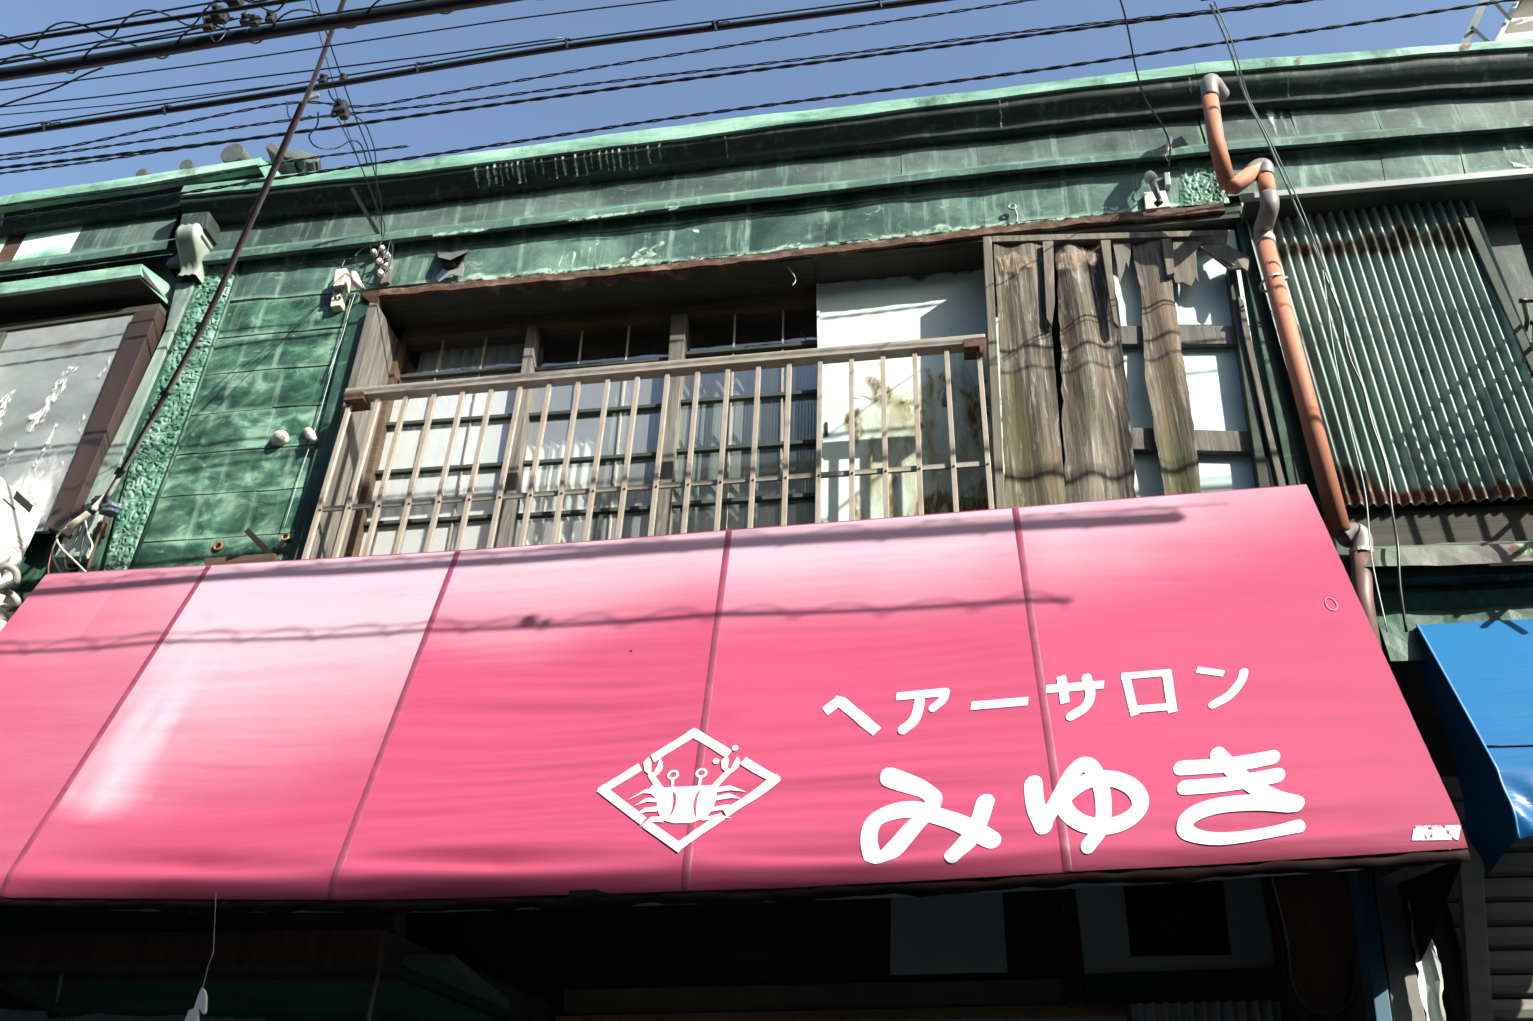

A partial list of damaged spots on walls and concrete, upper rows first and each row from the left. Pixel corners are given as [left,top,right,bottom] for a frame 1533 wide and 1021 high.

rust [1276,224,1472,260]
peeling [0,390,15,425]
peeling [8,367,78,517]
rust [845,408,864,441]
rust [868,364,1005,517]
rust [1335,464,1533,505]